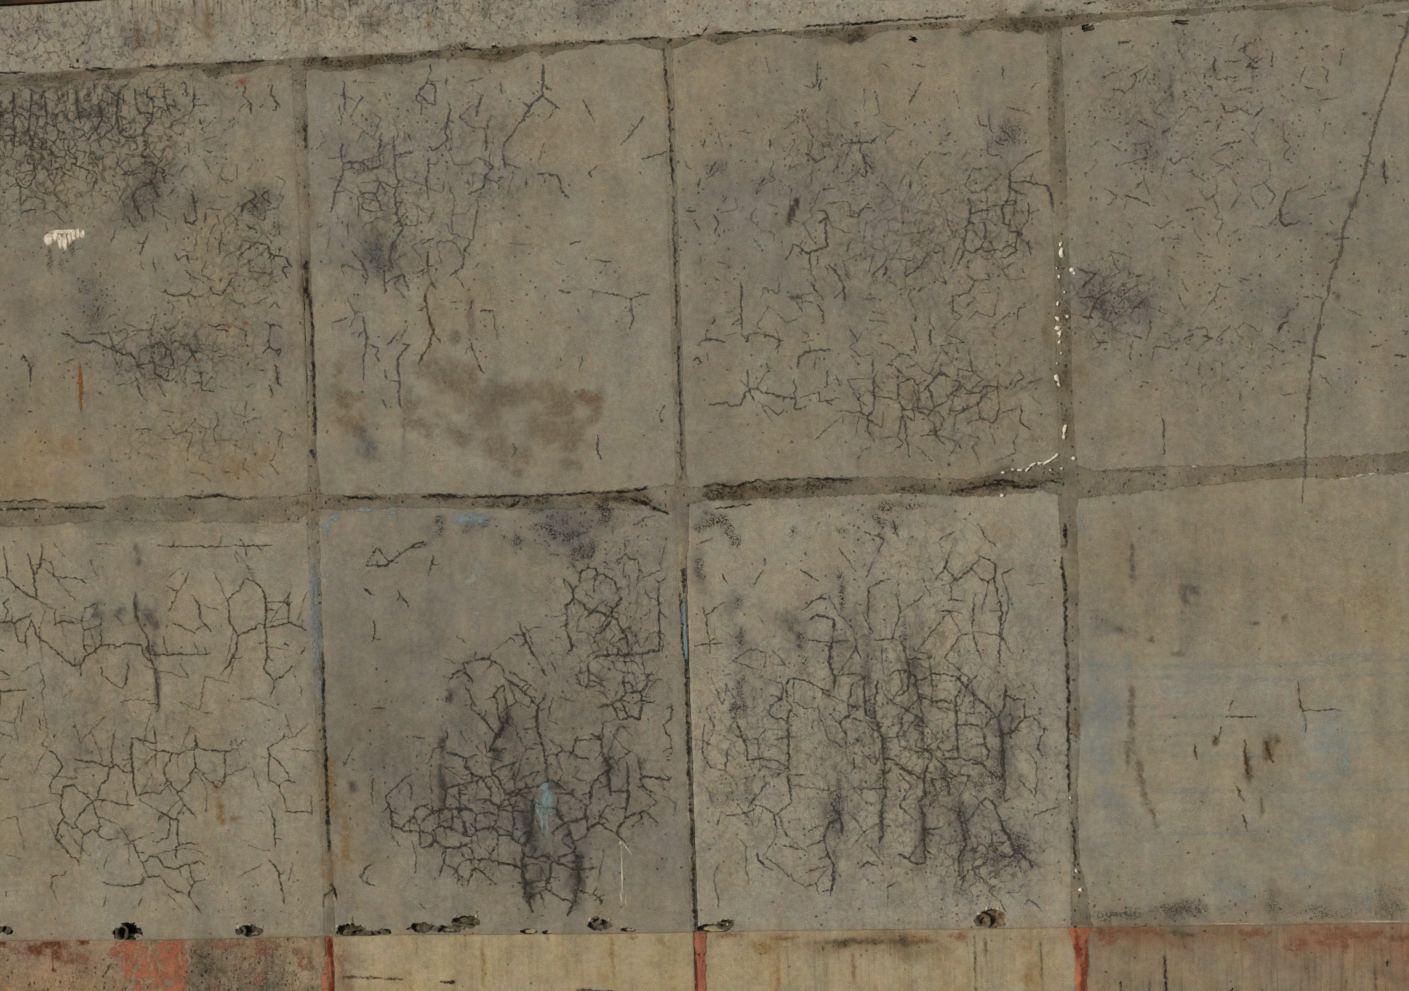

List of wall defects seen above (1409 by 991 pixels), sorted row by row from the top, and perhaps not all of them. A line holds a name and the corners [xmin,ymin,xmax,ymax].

crack [1045,2,1409,504]
spalling [0,925,30,954]
peeling [209,923,310,983]
spalling [587,916,637,932]
spalling [694,919,736,932]
spalling [973,907,1007,928]